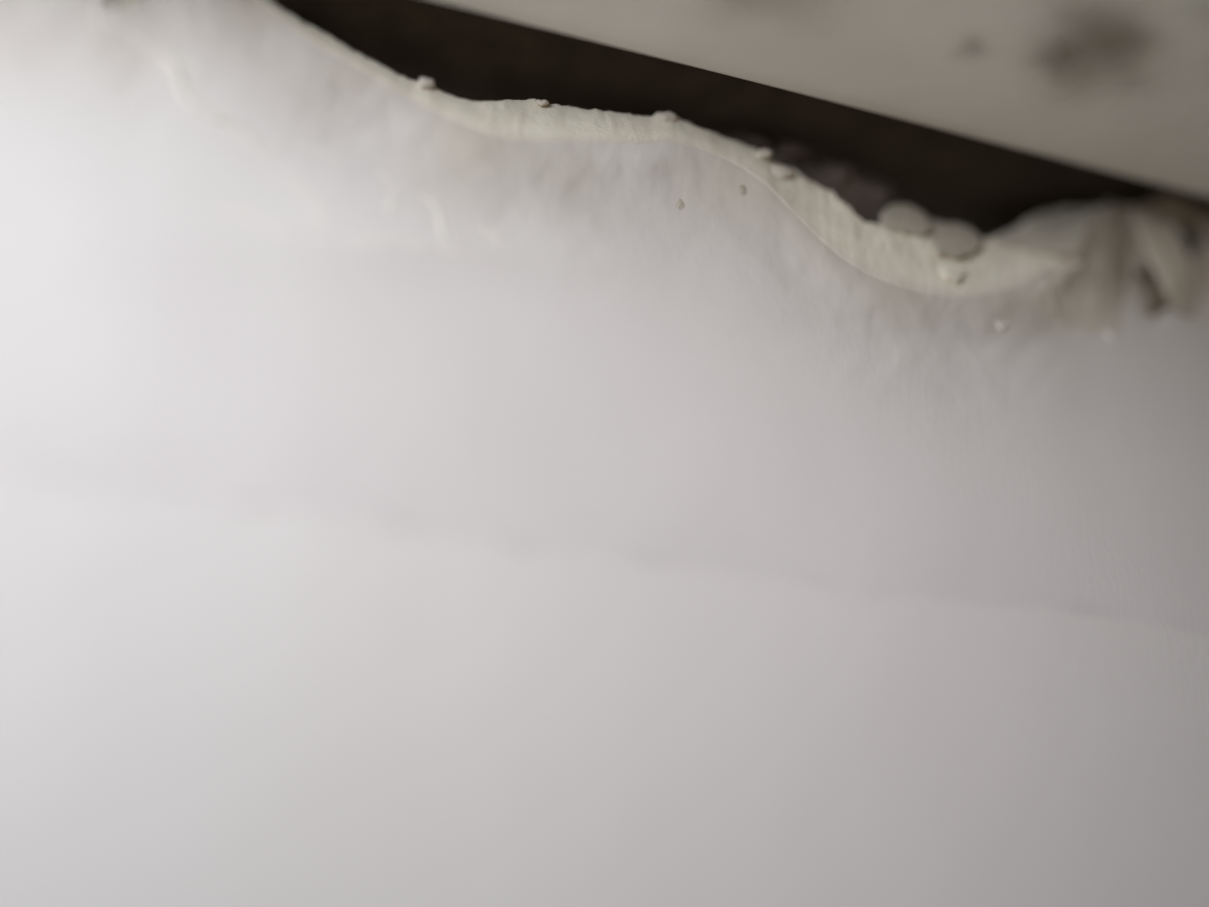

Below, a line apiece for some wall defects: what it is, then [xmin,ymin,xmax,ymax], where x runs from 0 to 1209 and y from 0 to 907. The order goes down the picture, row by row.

spalling [258,0,1084,298]
peeling [1128,192,1209,315]